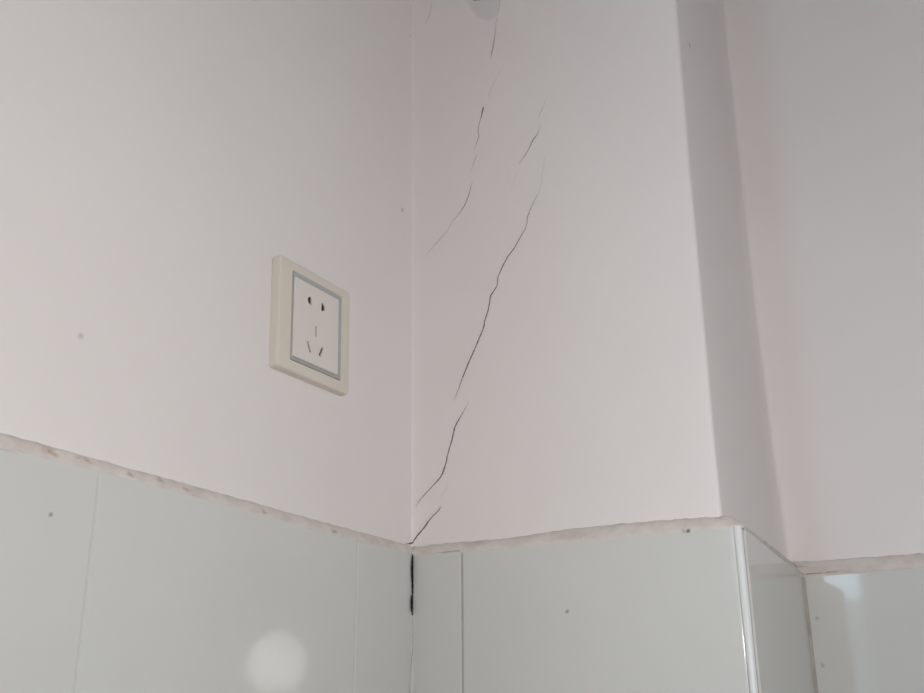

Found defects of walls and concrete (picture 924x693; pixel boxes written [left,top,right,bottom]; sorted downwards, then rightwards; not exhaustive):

crack [407,193,537,544]